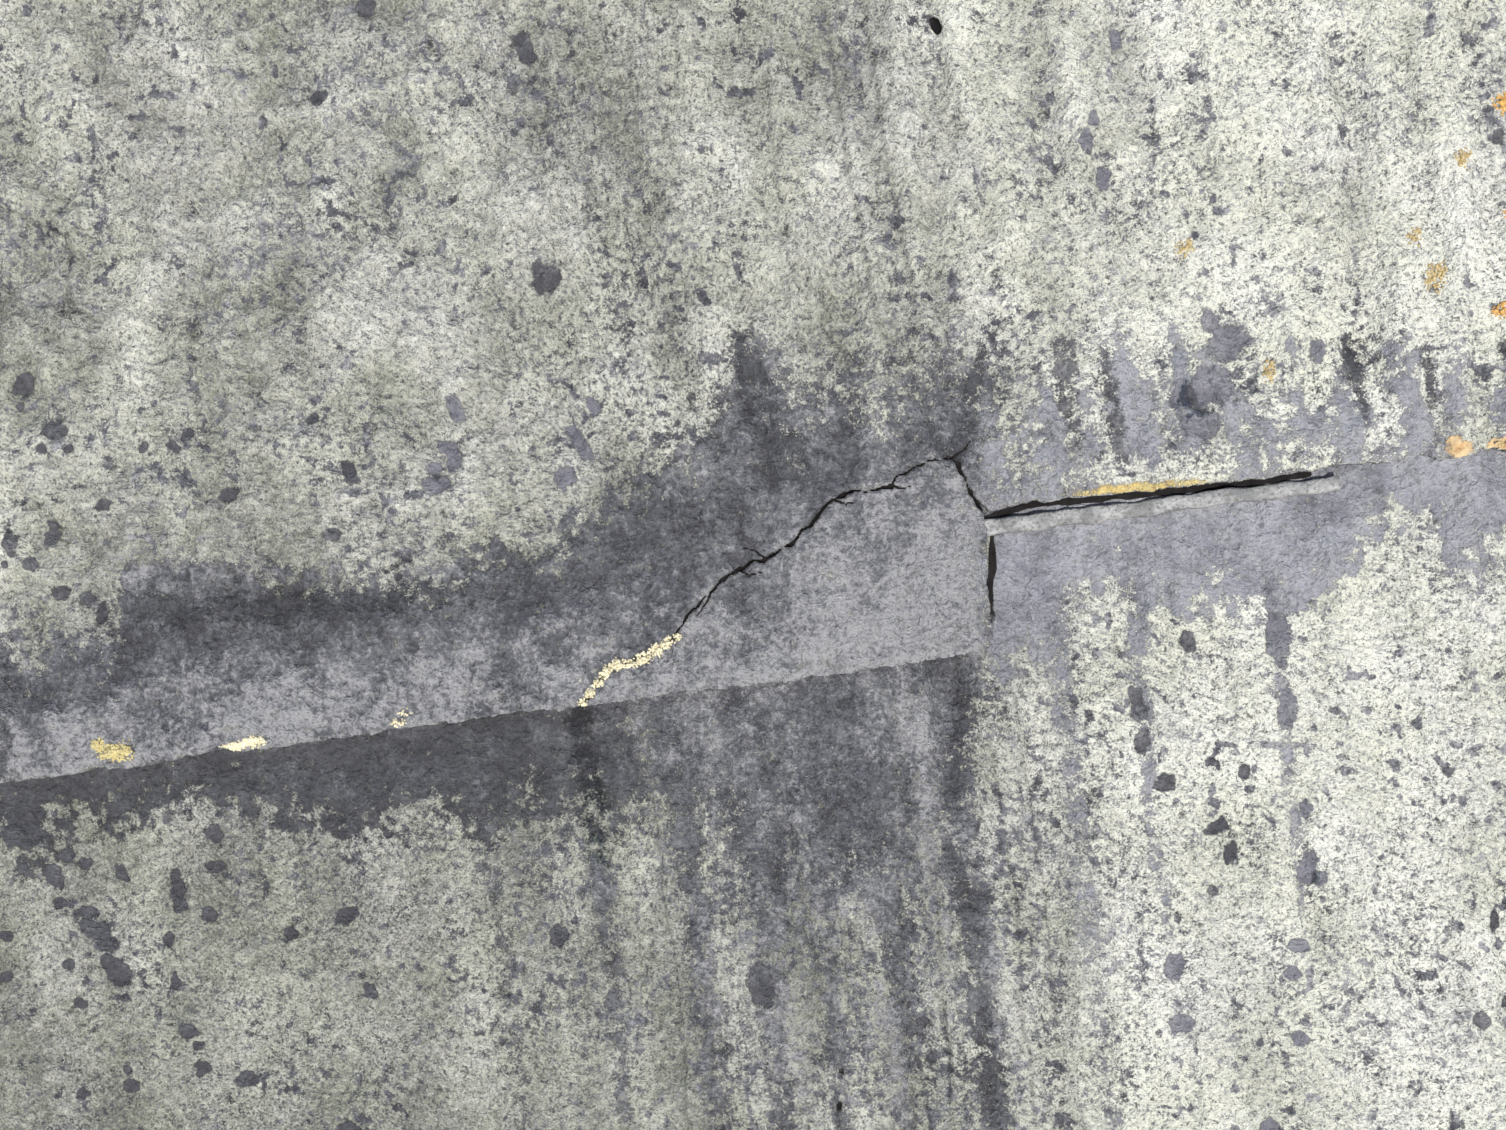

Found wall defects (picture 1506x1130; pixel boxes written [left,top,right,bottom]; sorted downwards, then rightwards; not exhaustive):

crack [580,441,989,706]
corrosion [1445,435,1506,458]
water stain [0,294,1506,1130]